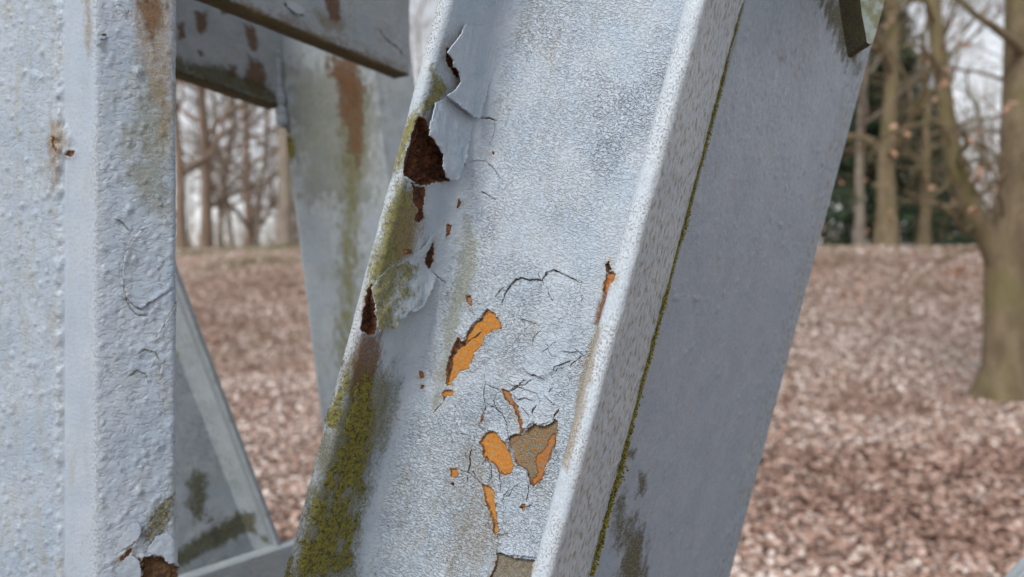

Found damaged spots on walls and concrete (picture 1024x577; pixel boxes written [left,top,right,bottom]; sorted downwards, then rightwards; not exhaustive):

rust [137,0,278,109]
rust [326,56,360,105]
peeling [391,24,500,223]
crack [115,218,177,381]
peeling [360,236,445,336]
peeling [434,295,508,412]
crack [460,269,582,533]
peeling [114,497,179,577]
peeling [450,387,559,577]